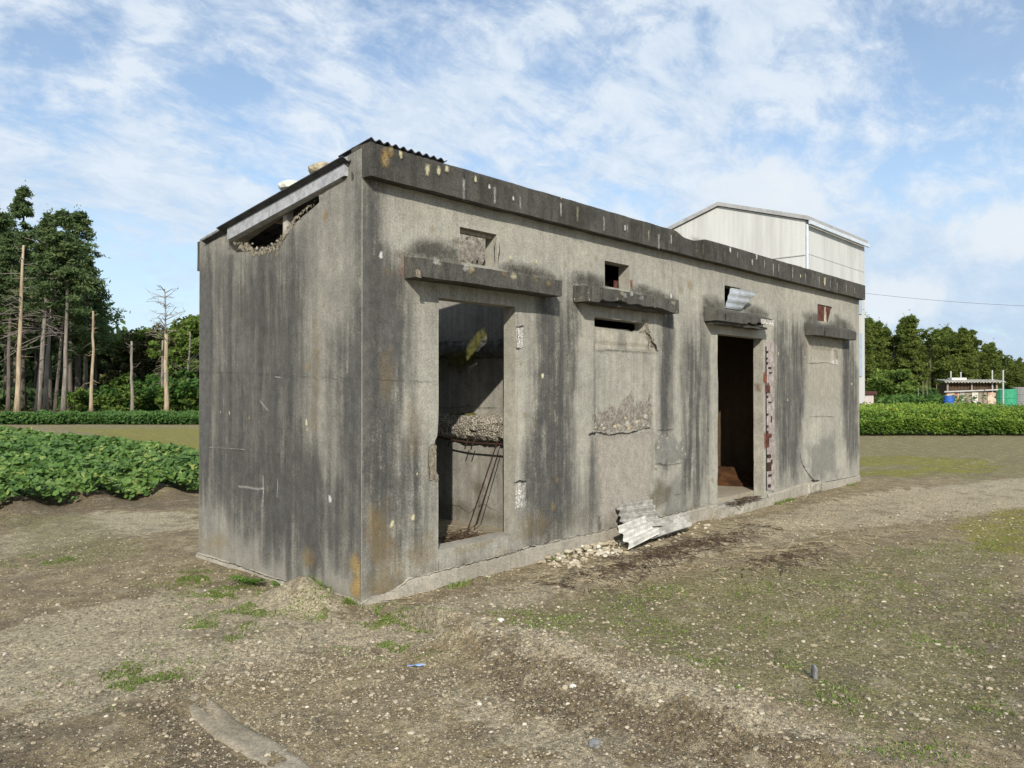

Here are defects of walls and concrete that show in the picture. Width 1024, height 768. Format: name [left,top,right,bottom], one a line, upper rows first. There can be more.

spalling [233,205,314,257]
damp [407,241,459,264]
damp [199,188,419,599]
damp [525,298,578,531]
peeling [592,391,654,523]
damp [774,314,858,476]